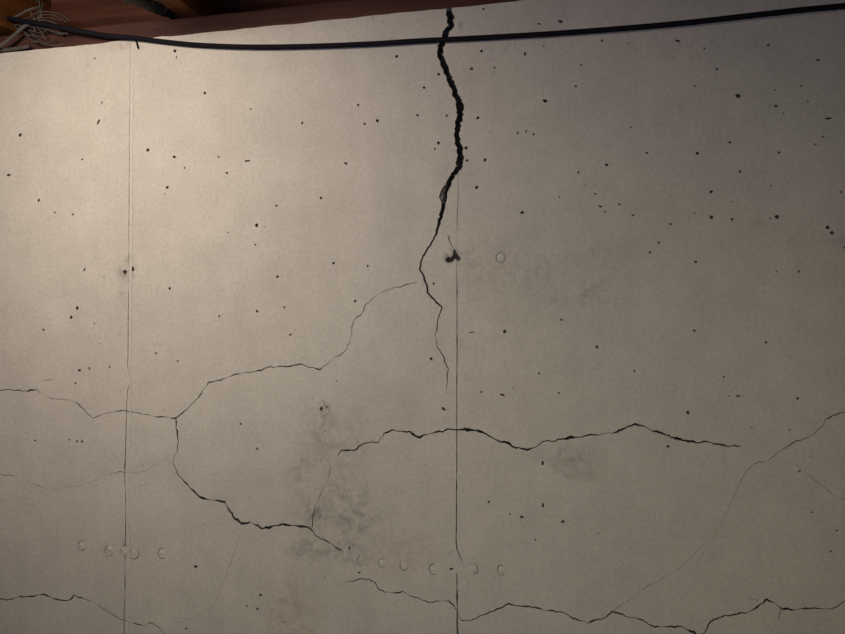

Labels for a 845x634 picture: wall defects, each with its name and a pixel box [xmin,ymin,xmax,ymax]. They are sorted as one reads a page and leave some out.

crack [0,7,464,619]
crack [0,594,165,634]
crack [338,411,845,634]